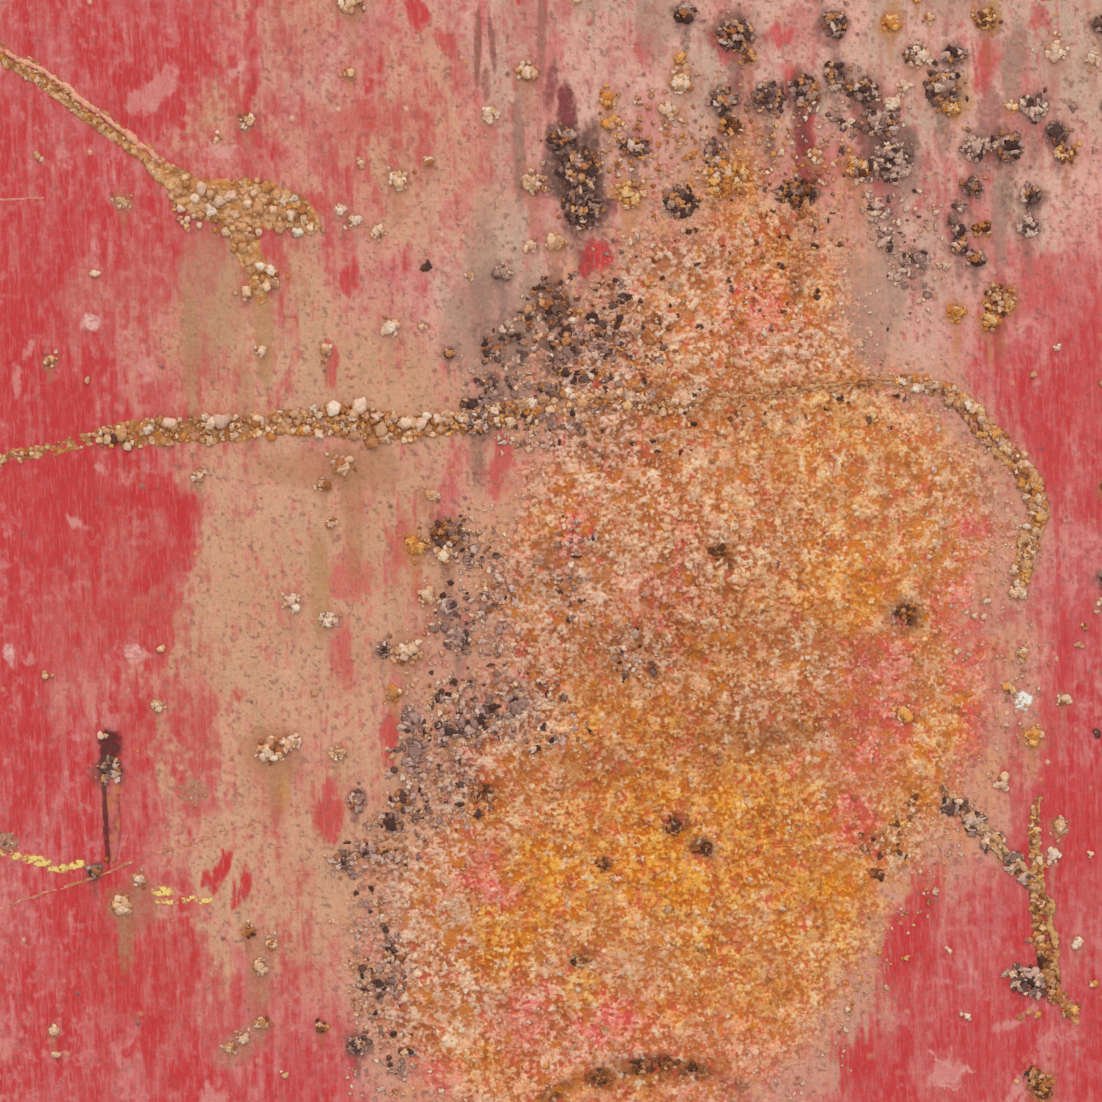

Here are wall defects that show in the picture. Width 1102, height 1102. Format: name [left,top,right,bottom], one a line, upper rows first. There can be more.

corrosion [337,0,367,21]
corrosion [666,2,698,33]
corrosion [714,10,758,67]
corrosion [818,1,849,42]
corrosion [970,0,1004,38]
corrosion [1083,15,1102,72]
corrosion [1003,87,1082,165]
corrosion [313,40,1056,1102]
corrosion [1056,694,1073,705]
peeling [0,833,19,852]
corrosion [1042,815,1069,869]
corrosion [1071,936,1084,952]